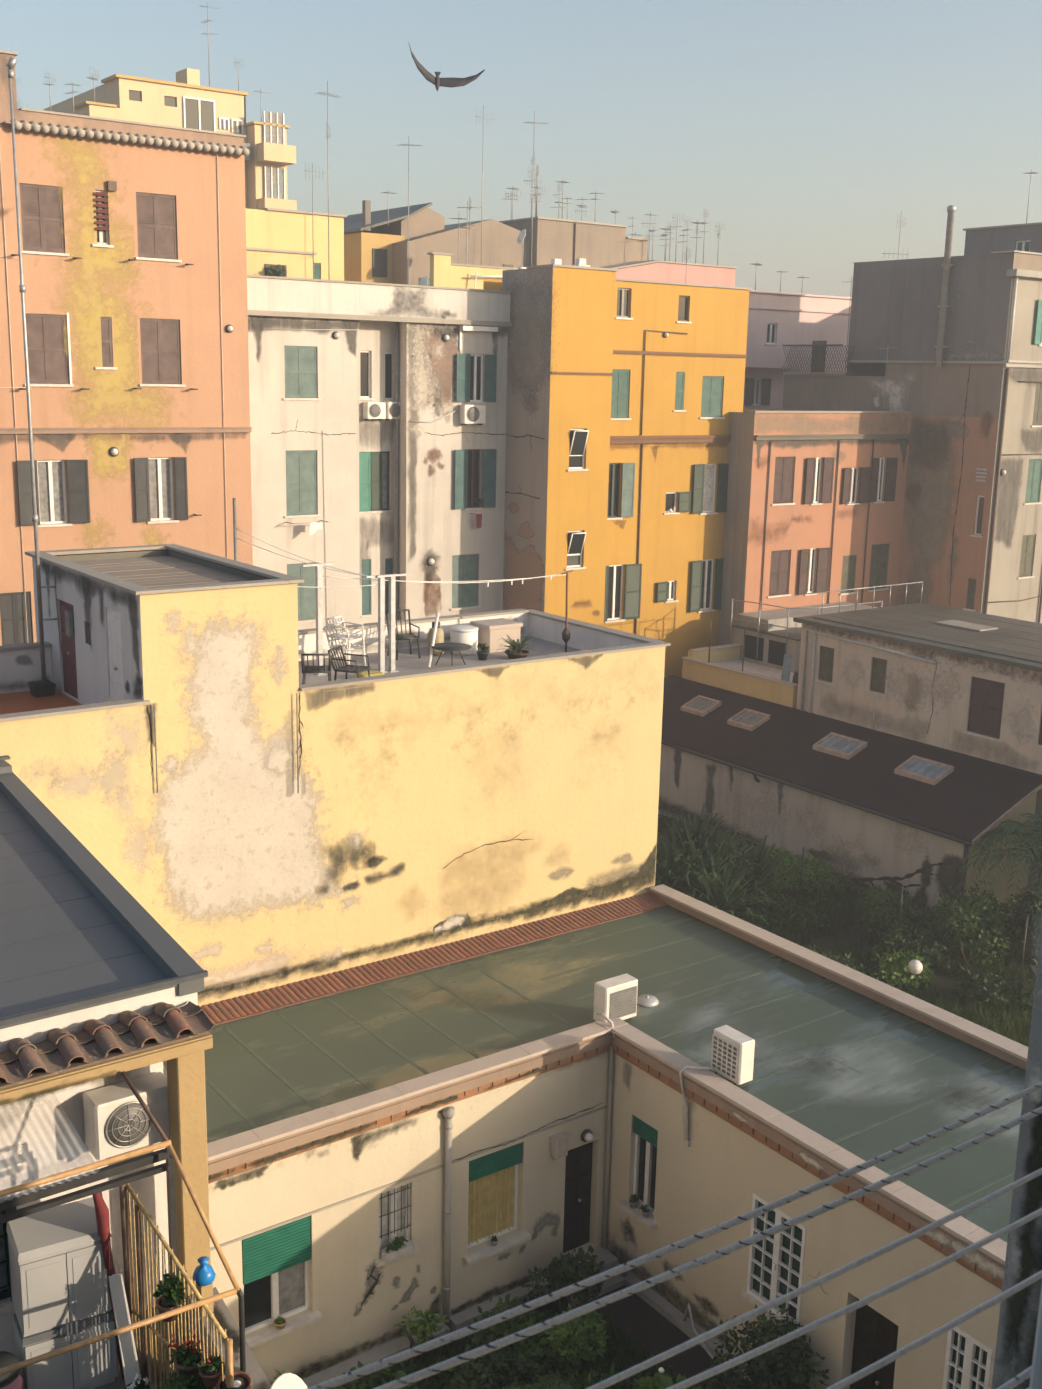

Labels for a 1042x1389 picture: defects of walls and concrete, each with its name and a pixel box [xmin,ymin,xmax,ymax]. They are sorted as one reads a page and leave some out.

damp [393,292,457,584]
crack [147,711,158,775]
peeling [149,612,359,921]
crack [296,692,304,770]
damp [658,765,762,849]
crack [443,830,534,869]
damp [197,843,656,998]
flaking render [355,1264,436,1316]